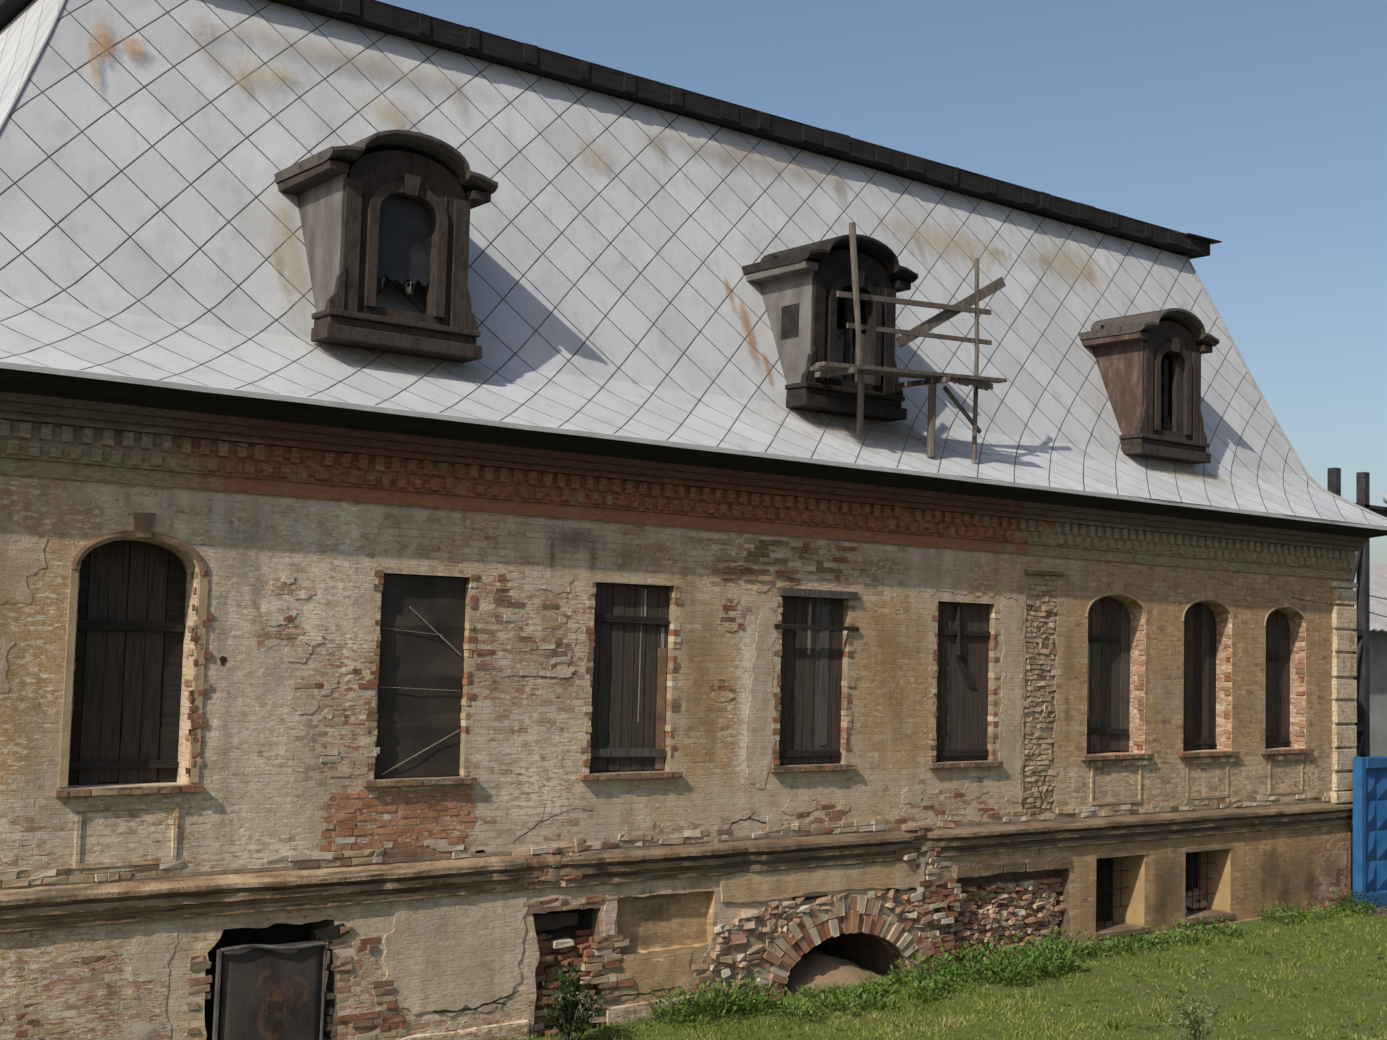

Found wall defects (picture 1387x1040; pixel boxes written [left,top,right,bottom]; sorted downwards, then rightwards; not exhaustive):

rust [741,313,768,368]
flaking render [257,575,476,851]
spalling [894,547,1065,824]
flaking render [336,891,819,1040]
spalling [857,855,1072,972]